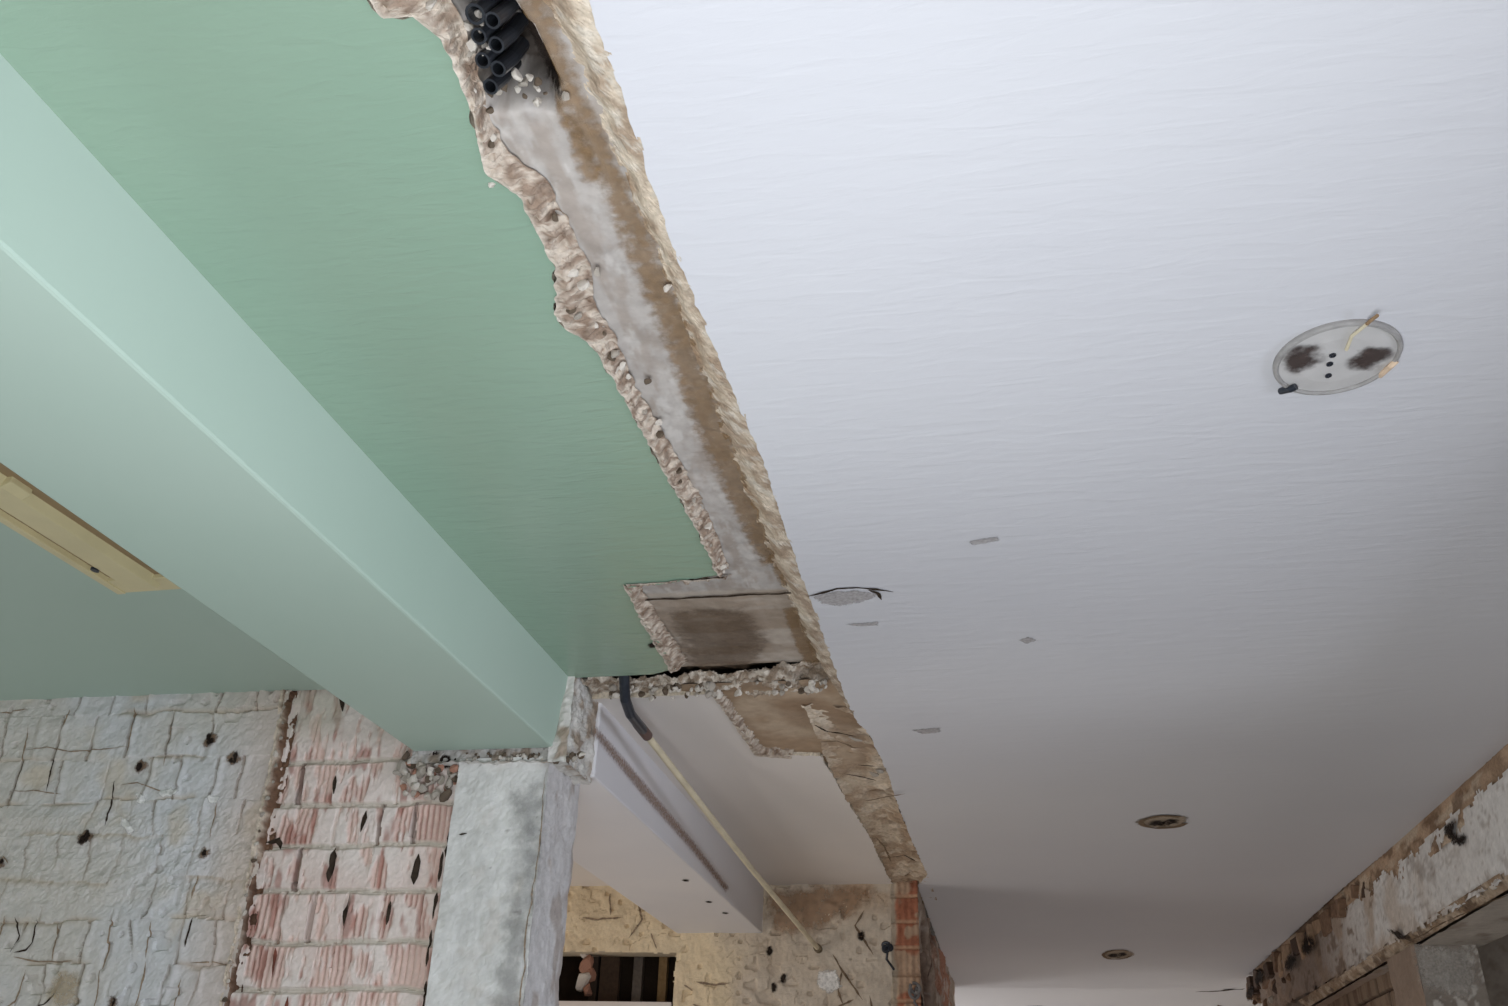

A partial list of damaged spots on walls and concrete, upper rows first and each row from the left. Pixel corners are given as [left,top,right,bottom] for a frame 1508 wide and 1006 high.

spalling [370,0,937,904]
crack [1,709,174,824]
spalling [326,848,337,882]
spalling [1246,744,1508,1006]
crack [0,876,236,1006]